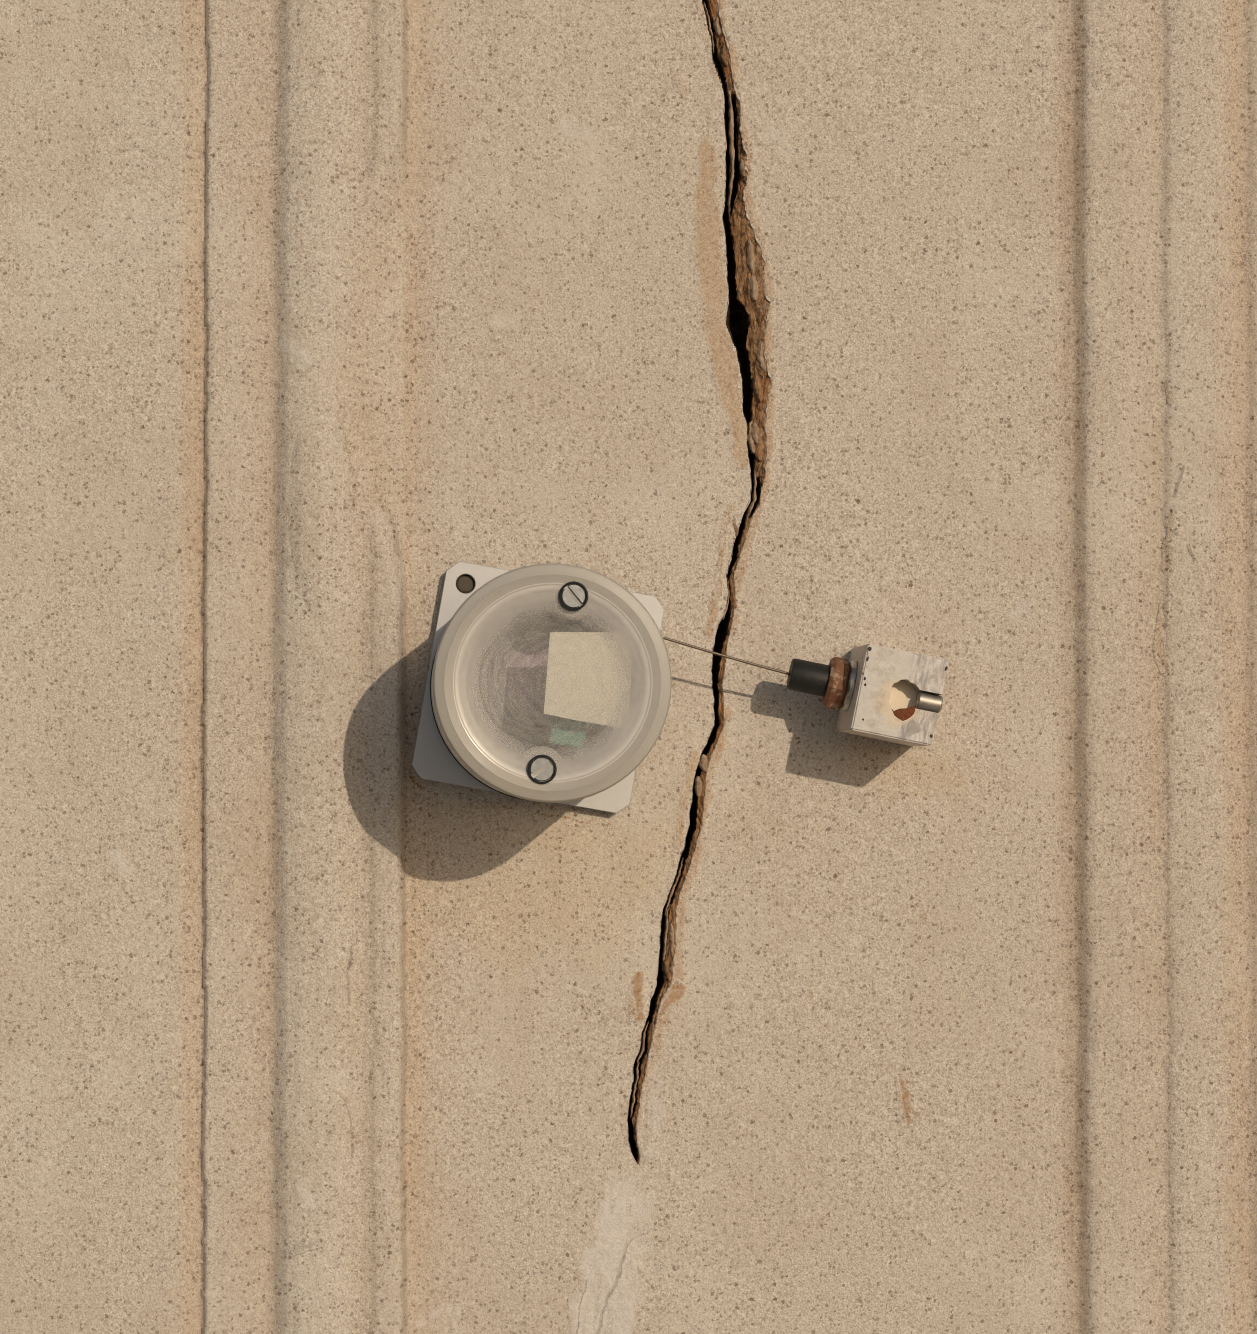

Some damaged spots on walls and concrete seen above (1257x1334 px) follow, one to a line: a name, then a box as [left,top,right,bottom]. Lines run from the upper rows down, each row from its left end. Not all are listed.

crack [576,0,761,1334]